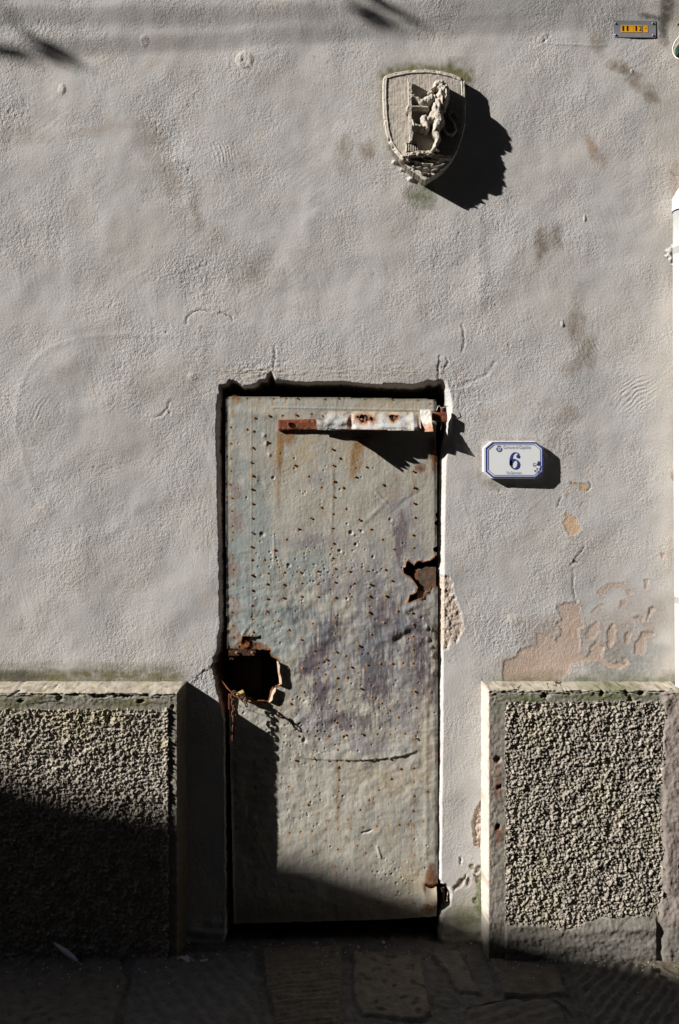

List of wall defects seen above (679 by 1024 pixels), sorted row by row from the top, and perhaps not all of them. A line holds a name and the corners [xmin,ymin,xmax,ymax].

peeling [562,482,588,535]
flaking render [438,575,464,650]
peeling [502,579,656,682]